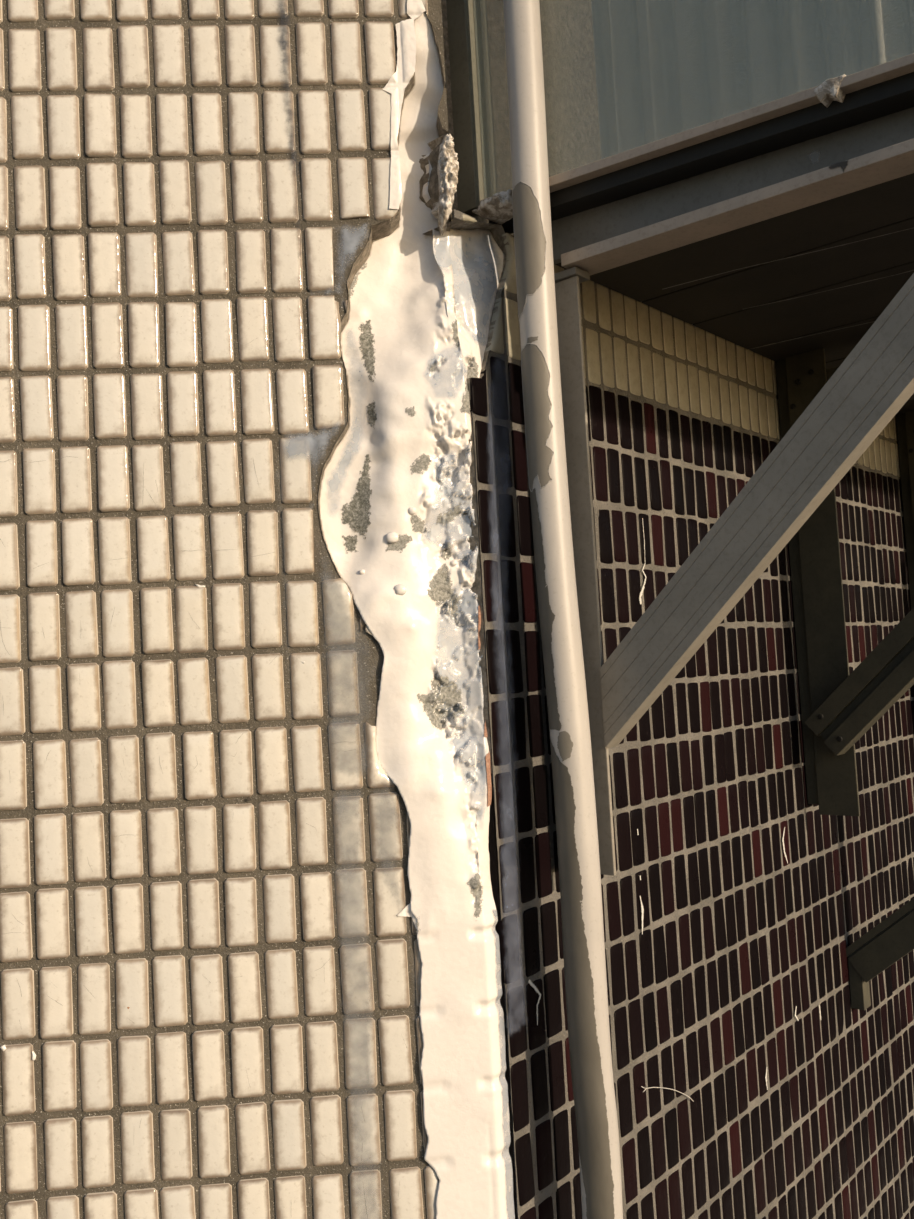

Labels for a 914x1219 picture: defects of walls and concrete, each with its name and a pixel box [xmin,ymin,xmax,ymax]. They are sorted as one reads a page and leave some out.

spalling [318,207,401,613]
spalling [387,12,547,935]
spalling [500,955,517,1219]
peeling [521,336,615,1219]